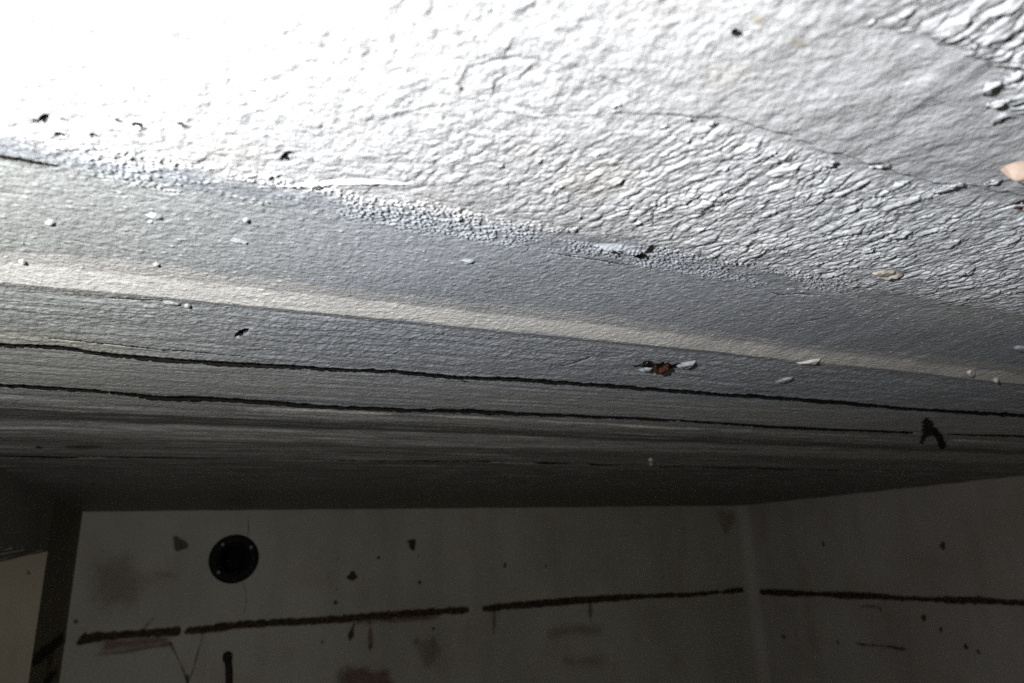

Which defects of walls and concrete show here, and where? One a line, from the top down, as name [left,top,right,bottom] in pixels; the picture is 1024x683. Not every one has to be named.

crack [0,329,1024,437]
spalling [920,418,946,449]